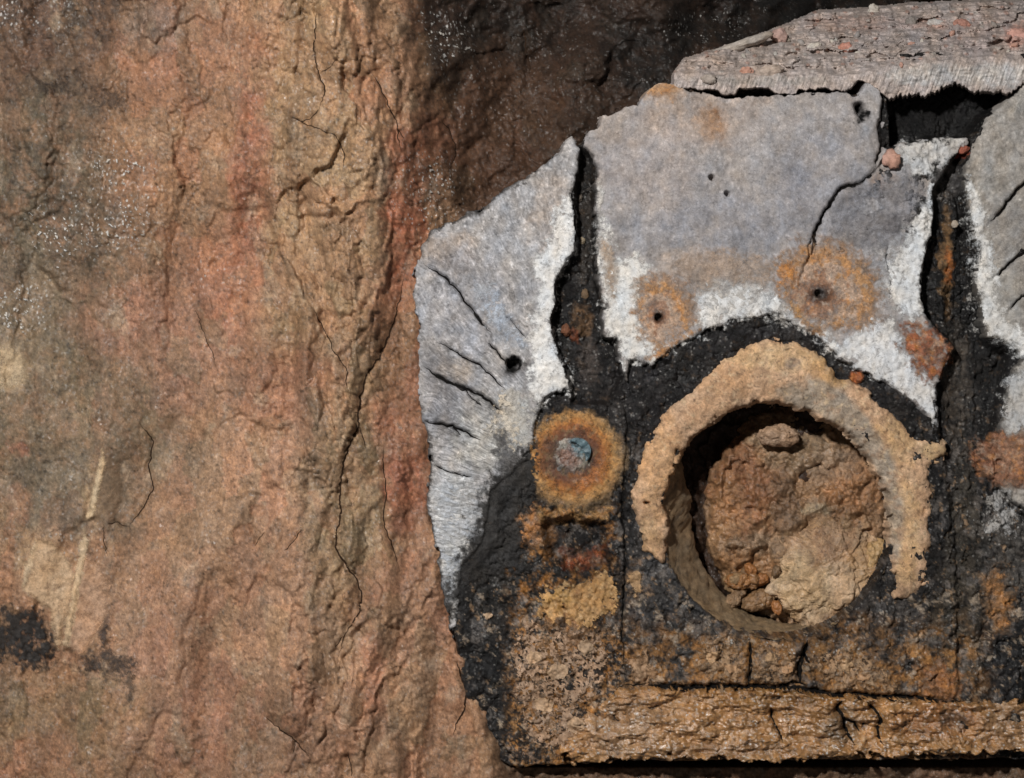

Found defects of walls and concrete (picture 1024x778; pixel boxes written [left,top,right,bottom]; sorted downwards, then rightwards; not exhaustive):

crack [292,17,345,168]
crack [375,78,405,148]
crack [809,131,882,257]
leakage [473,194,580,476]
rust [629,272,697,360]
rust [776,234,884,335]
rust [899,320,953,382]
crack [315,265,526,664]
leakage [429,476,483,613]
rust [517,409,629,545]
rust [970,430,1024,488]
leakage [982,489,1021,534]